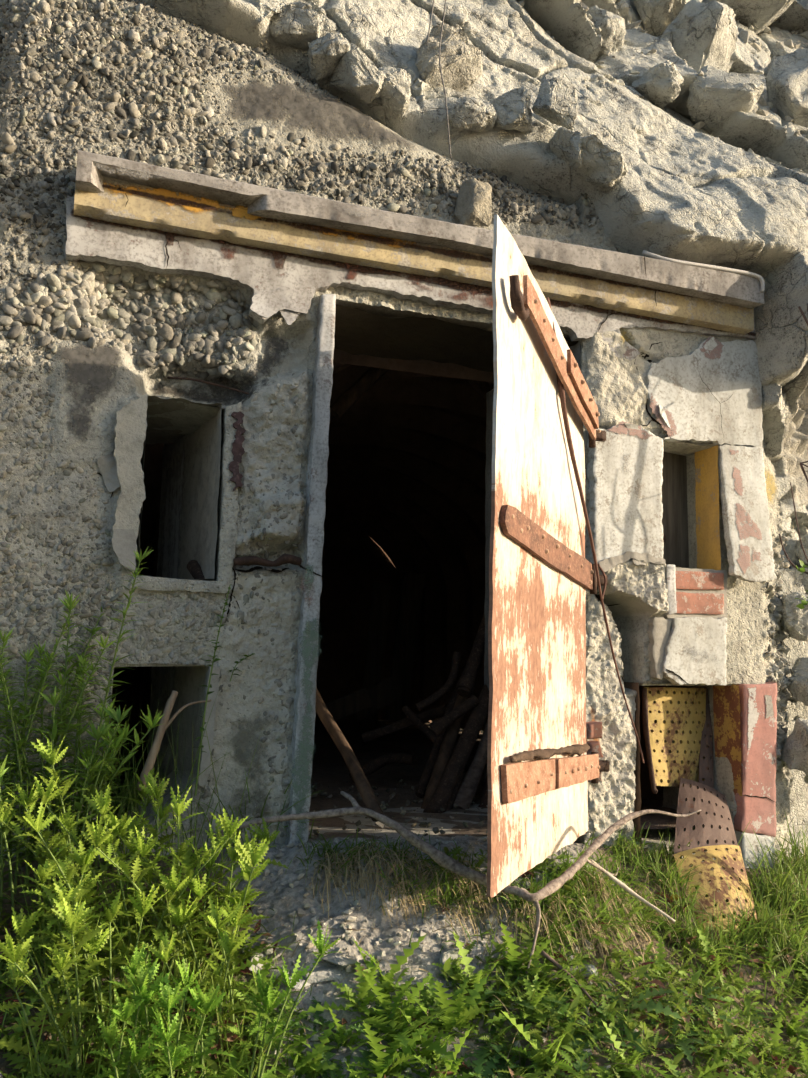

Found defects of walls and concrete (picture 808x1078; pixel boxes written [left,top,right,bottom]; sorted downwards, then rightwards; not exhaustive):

leakage [61,345,121,438]
rust [71,209,493,308]
rust [102,182,492,262]
spalling [0,0,603,572]
rust [528,264,698,298]
spalling [586,329,677,440]
rust [550,299,723,332]
flaking render [701,336,724,360]
rust [228,411,246,491]
rust [233,554,302,567]